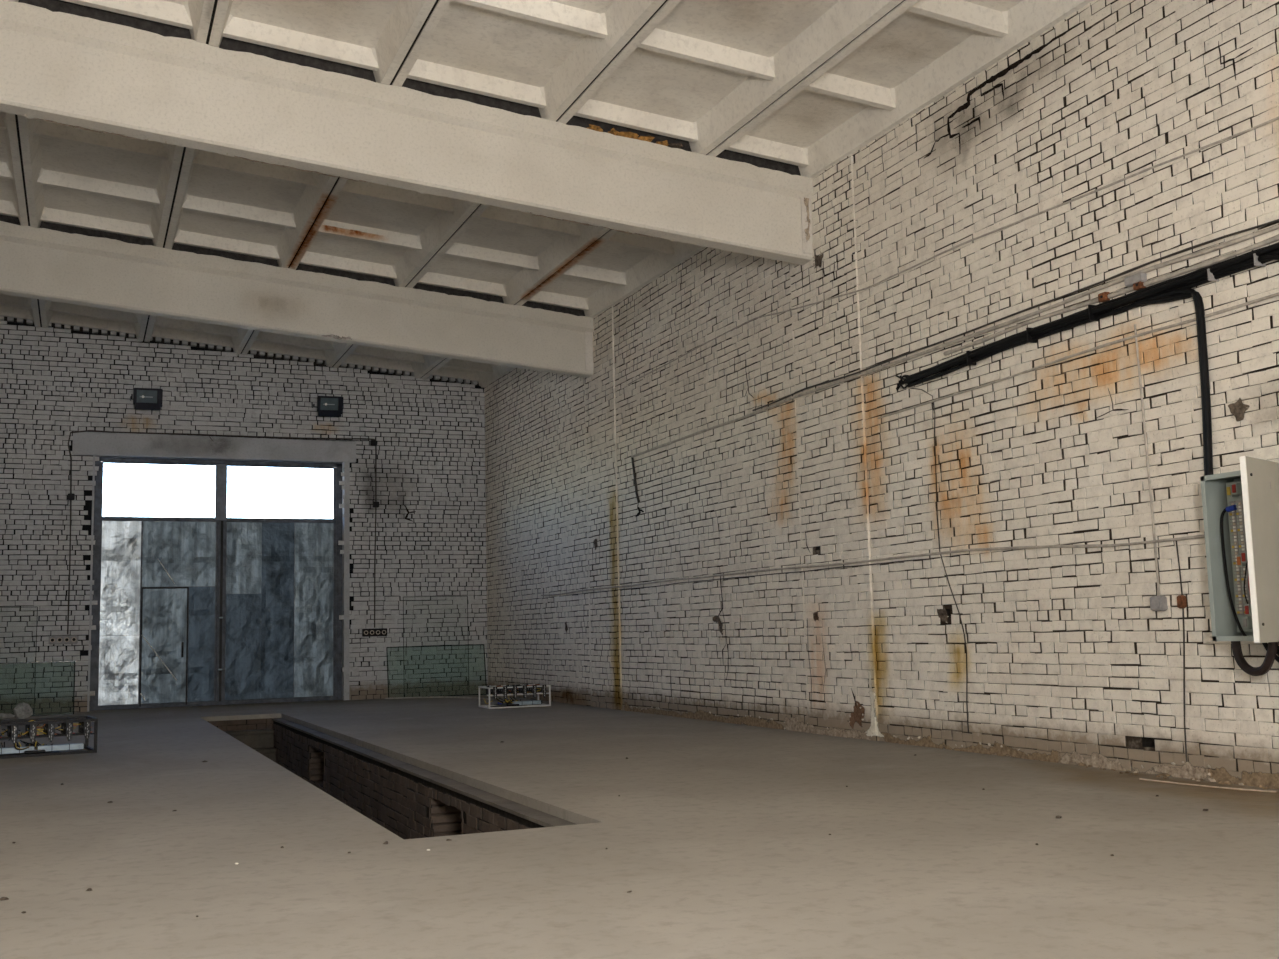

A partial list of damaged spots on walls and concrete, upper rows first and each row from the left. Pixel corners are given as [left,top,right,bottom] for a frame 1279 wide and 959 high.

crack [924,30,1068,158]